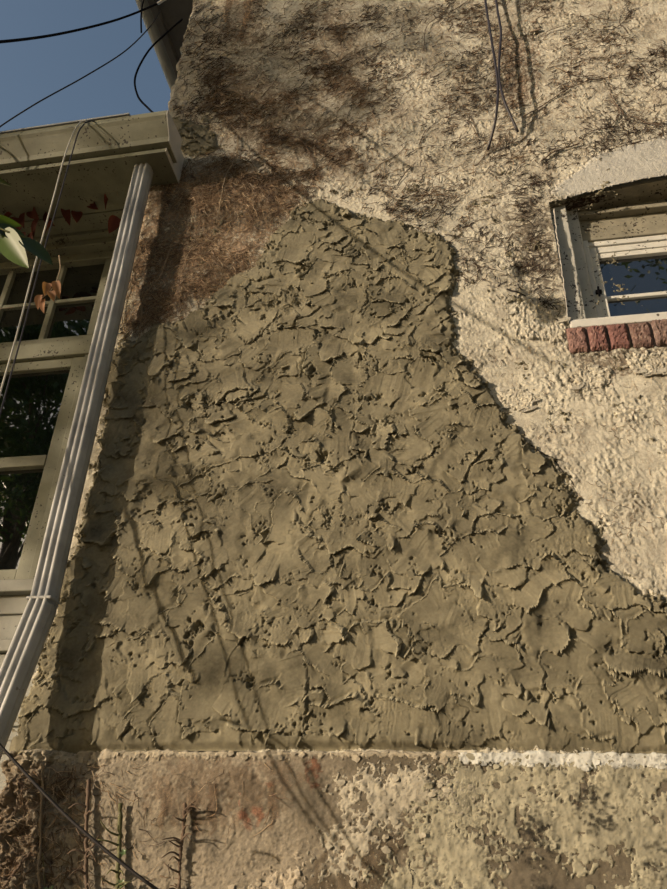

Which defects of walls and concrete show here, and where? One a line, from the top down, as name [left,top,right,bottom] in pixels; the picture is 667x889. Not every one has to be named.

flaking render [0,774,26,882]
peeling [21,749,667,889]
damp [520,810,553,869]
damp [577,785,617,835]